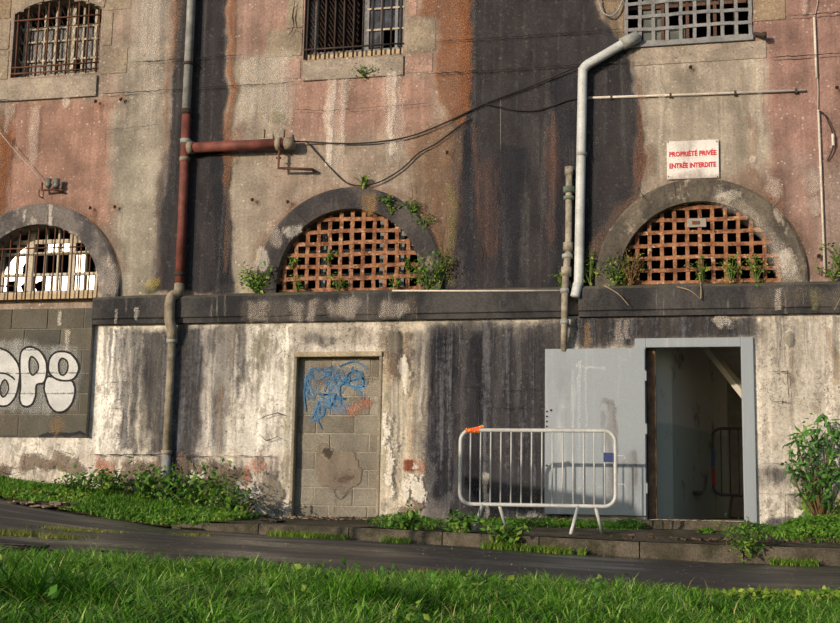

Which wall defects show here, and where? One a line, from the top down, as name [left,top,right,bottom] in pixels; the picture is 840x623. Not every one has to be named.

rust [419,0,471,123]
leakage [443,0,646,292]
spalling [314,443,362,494]
peeling [381,412,428,515]
leakage [422,315,757,524]